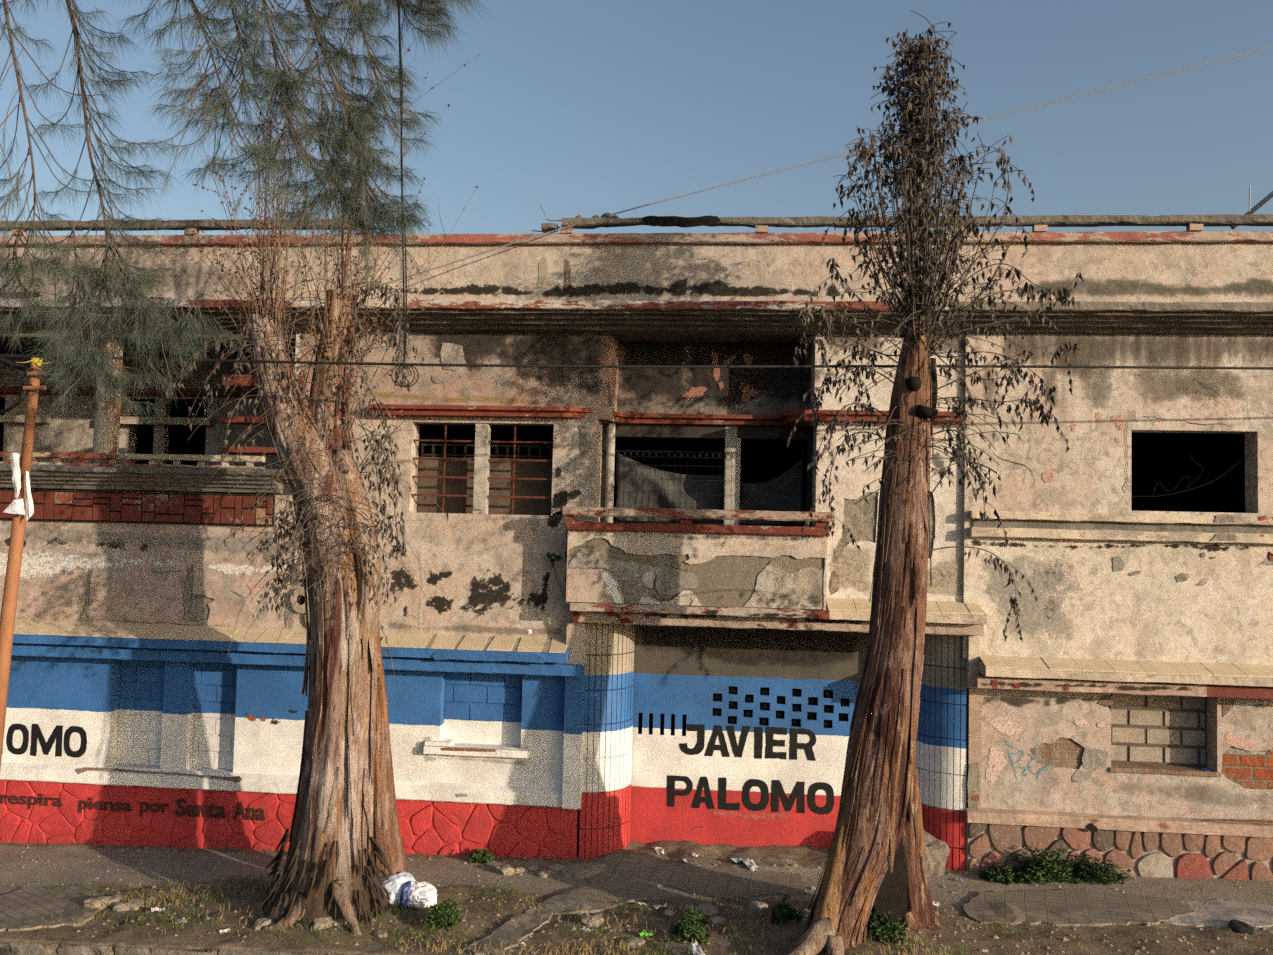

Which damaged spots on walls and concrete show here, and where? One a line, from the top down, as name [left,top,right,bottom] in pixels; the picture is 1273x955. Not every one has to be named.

damp [401,259,841,297]
damp [687,342,811,406]
damp [1006,334,1273,406]
damp [0,526,289,579]
spalling [567,492,878,610]
spalling [1201,514,1242,559]
spalling [1259,552,1273,565]
peeling [989,717,1022,737]
spalling [1030,719,1109,783]
peeling [1097,696,1113,706]
peeling [1218,700,1235,717]
spalling [1221,732,1273,789]